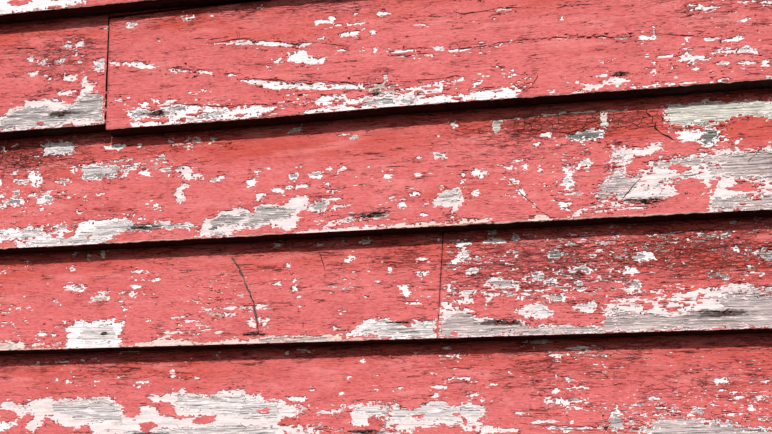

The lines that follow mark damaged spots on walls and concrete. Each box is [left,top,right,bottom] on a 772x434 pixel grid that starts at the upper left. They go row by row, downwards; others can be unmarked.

peeling [0,0,112,14]
peeling [0,6,559,132]
peeling [451,0,517,23]
peeling [546,0,772,94]
crack [231,257,261,333]
peeling [0,92,772,434]